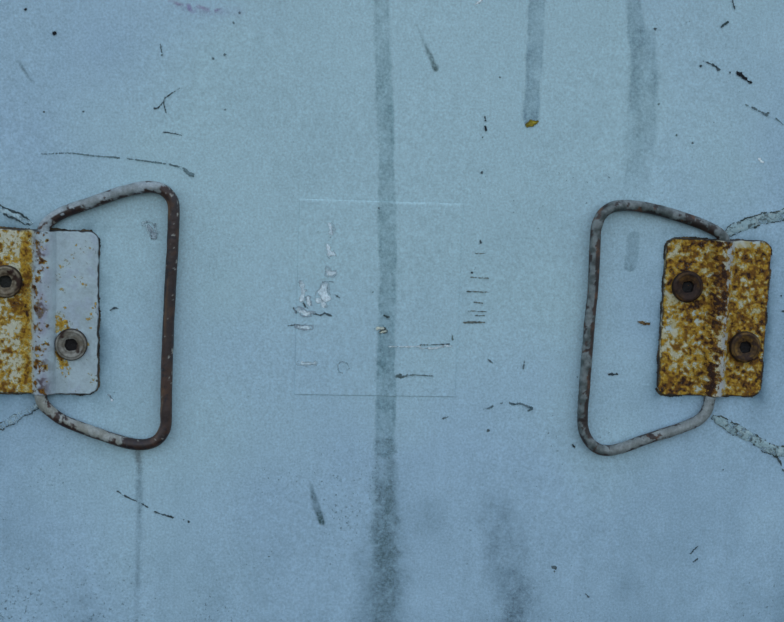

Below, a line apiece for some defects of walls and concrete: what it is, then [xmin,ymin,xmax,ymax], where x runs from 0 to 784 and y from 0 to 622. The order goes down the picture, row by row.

rust [0,230,78,395]
rust [657,239,771,397]